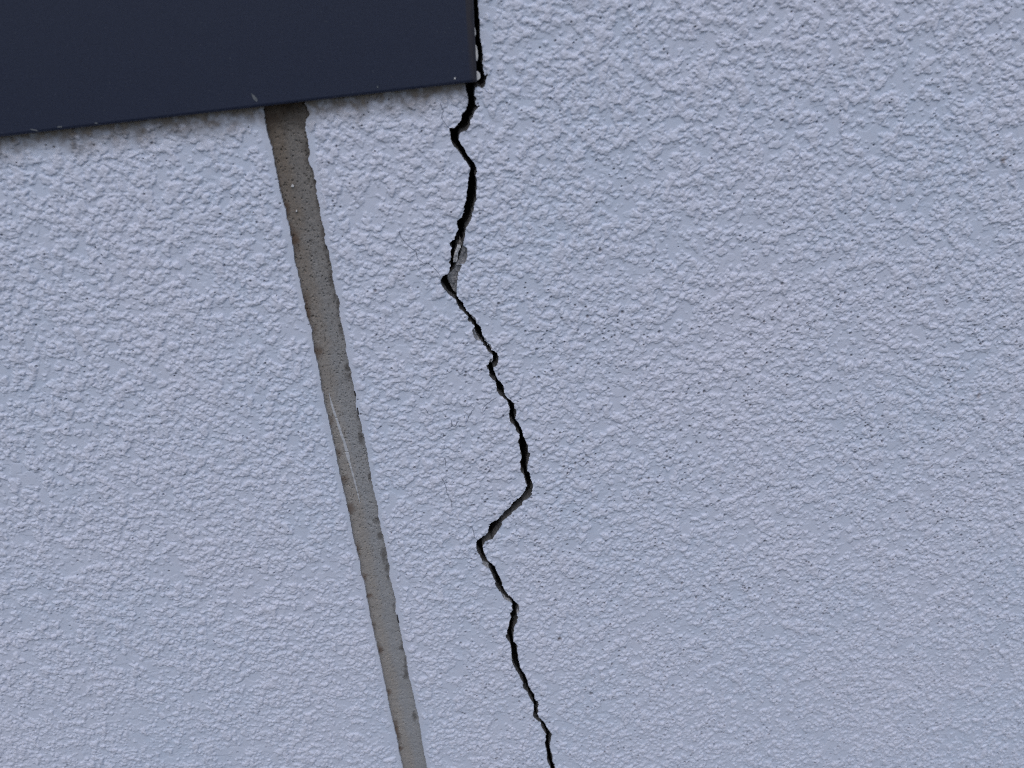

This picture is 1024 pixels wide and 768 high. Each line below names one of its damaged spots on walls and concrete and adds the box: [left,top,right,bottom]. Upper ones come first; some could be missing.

crack [399,0,555,768]